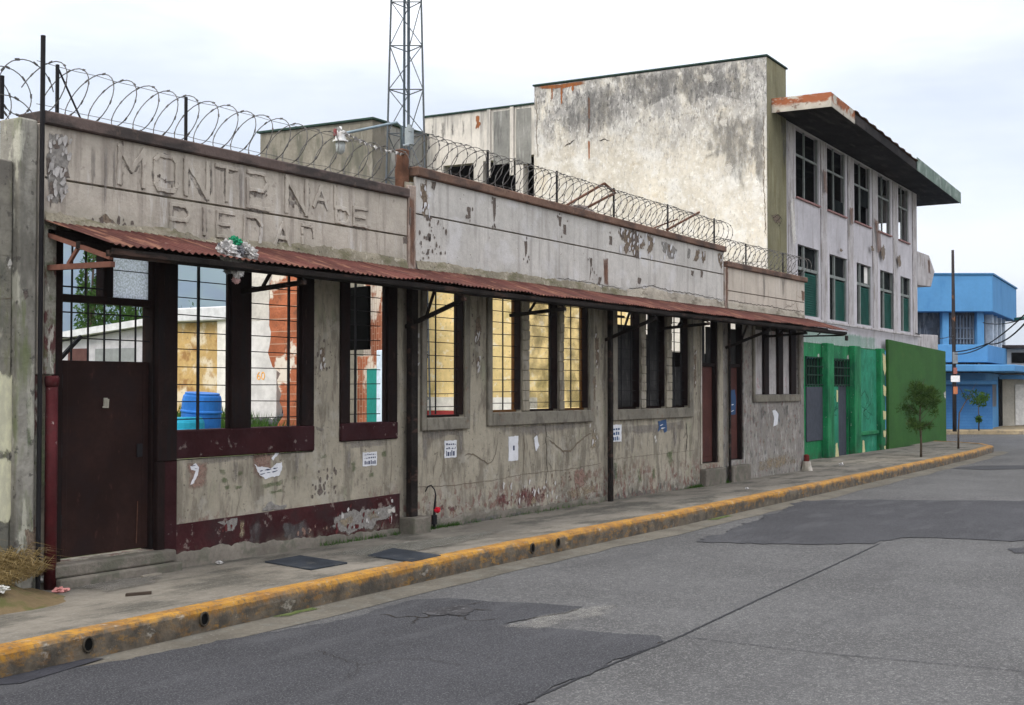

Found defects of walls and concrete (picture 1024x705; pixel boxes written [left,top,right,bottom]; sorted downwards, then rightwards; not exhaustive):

corrosion [539,81,584,104]
peeling [46,134,72,207]
spalling [403,180,805,318]
spalling [176,499,399,568]